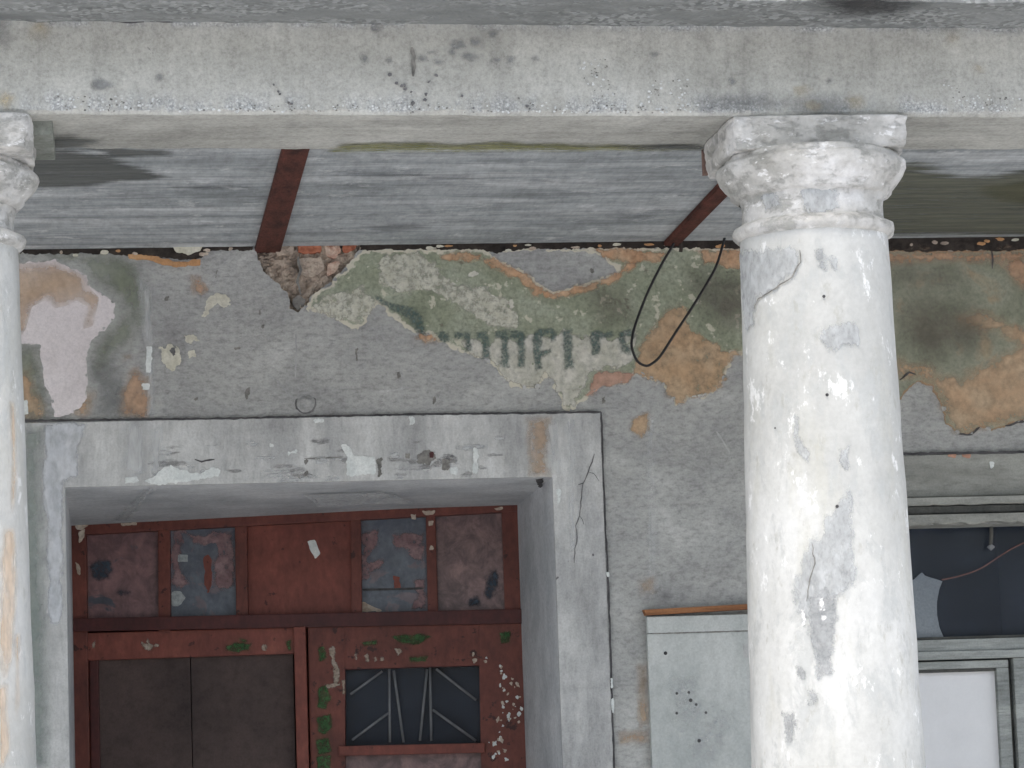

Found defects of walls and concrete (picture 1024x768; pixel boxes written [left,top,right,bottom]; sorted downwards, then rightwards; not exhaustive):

damp [33,139,165,187]
peeling [19,240,801,417]
peeling [888,237,1024,436]
spalling [125,451,230,485]
spalling [248,441,484,482]
crack [25,411,615,768]
peeling [793,492,856,702]
peeling [782,713,796,742]